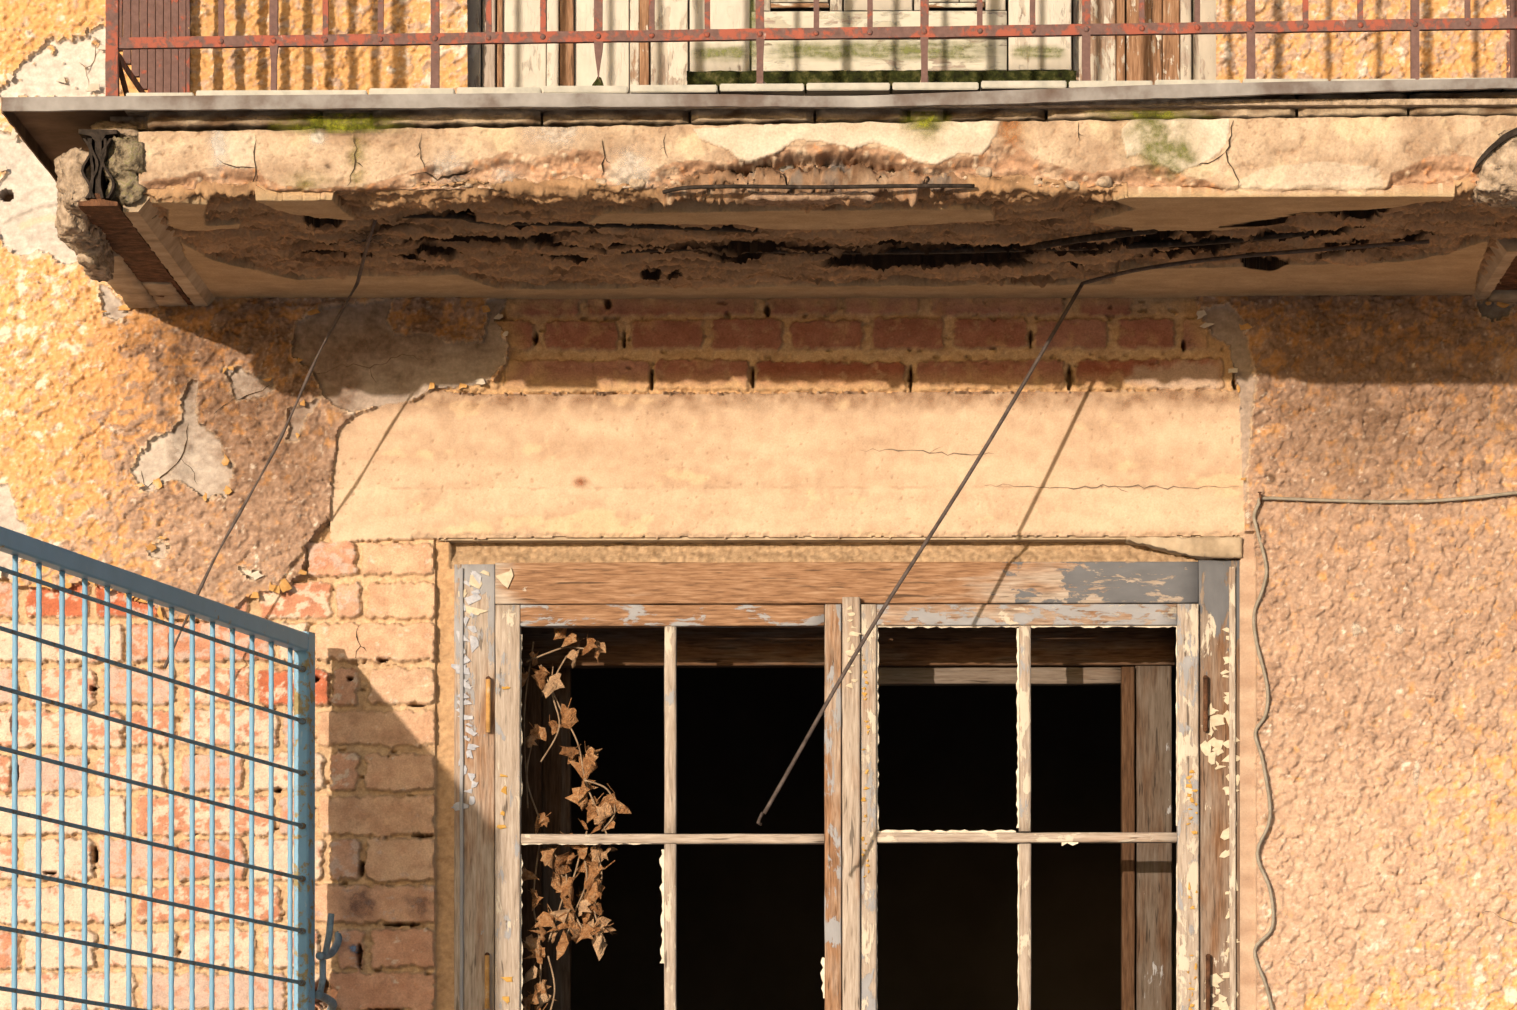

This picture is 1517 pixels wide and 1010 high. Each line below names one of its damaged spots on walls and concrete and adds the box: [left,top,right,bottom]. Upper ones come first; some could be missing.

peeling [0,19,106,98]
peeling [0,128,78,265]
spalling [130,118,1517,502]
peeling [1186,628,1240,834]
peeling [1219,821,1237,858]